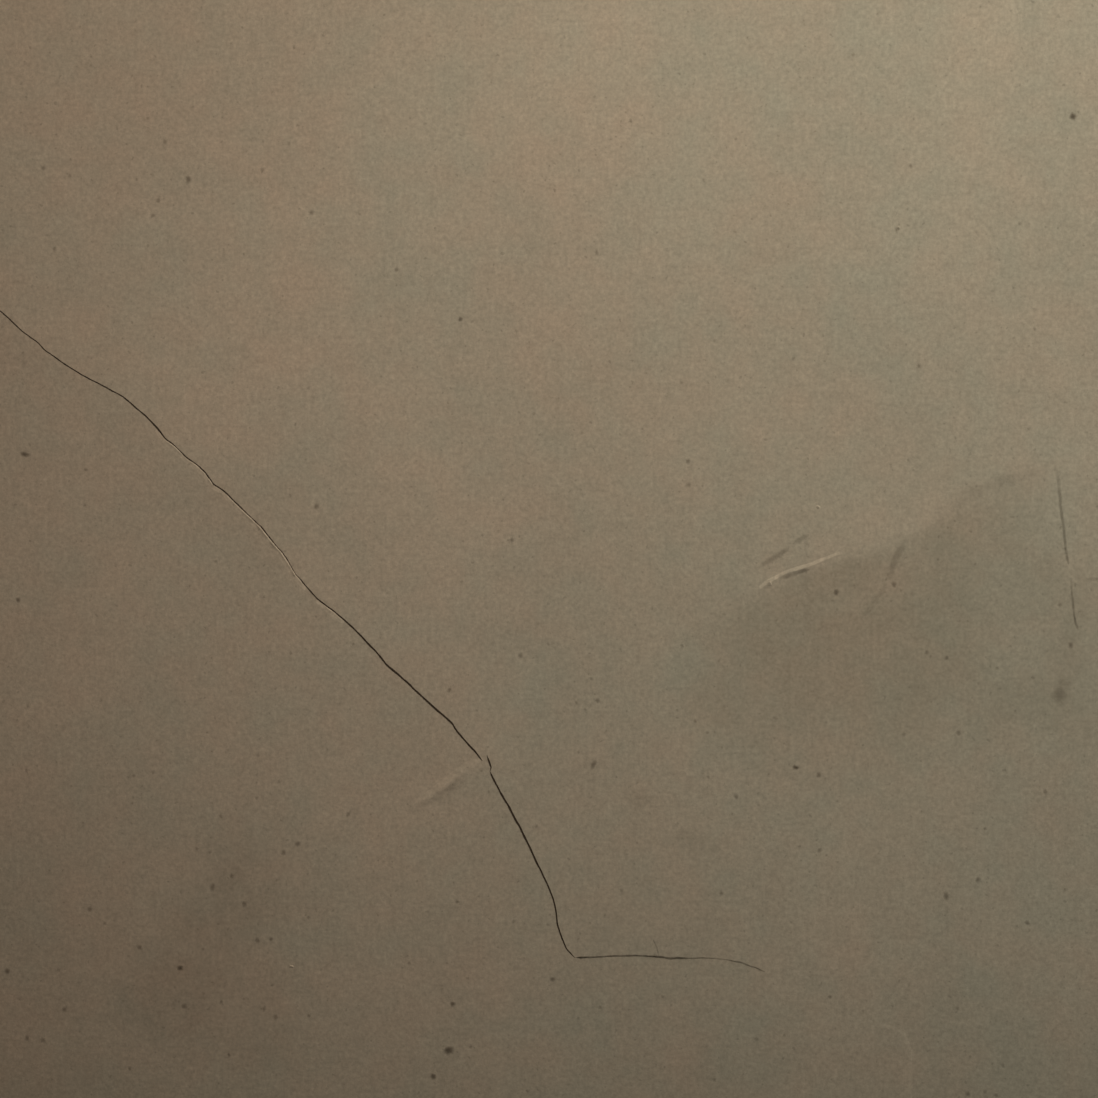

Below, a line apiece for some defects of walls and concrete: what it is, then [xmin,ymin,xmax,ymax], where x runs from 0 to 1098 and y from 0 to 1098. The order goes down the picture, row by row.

crack [0,311,684,959]